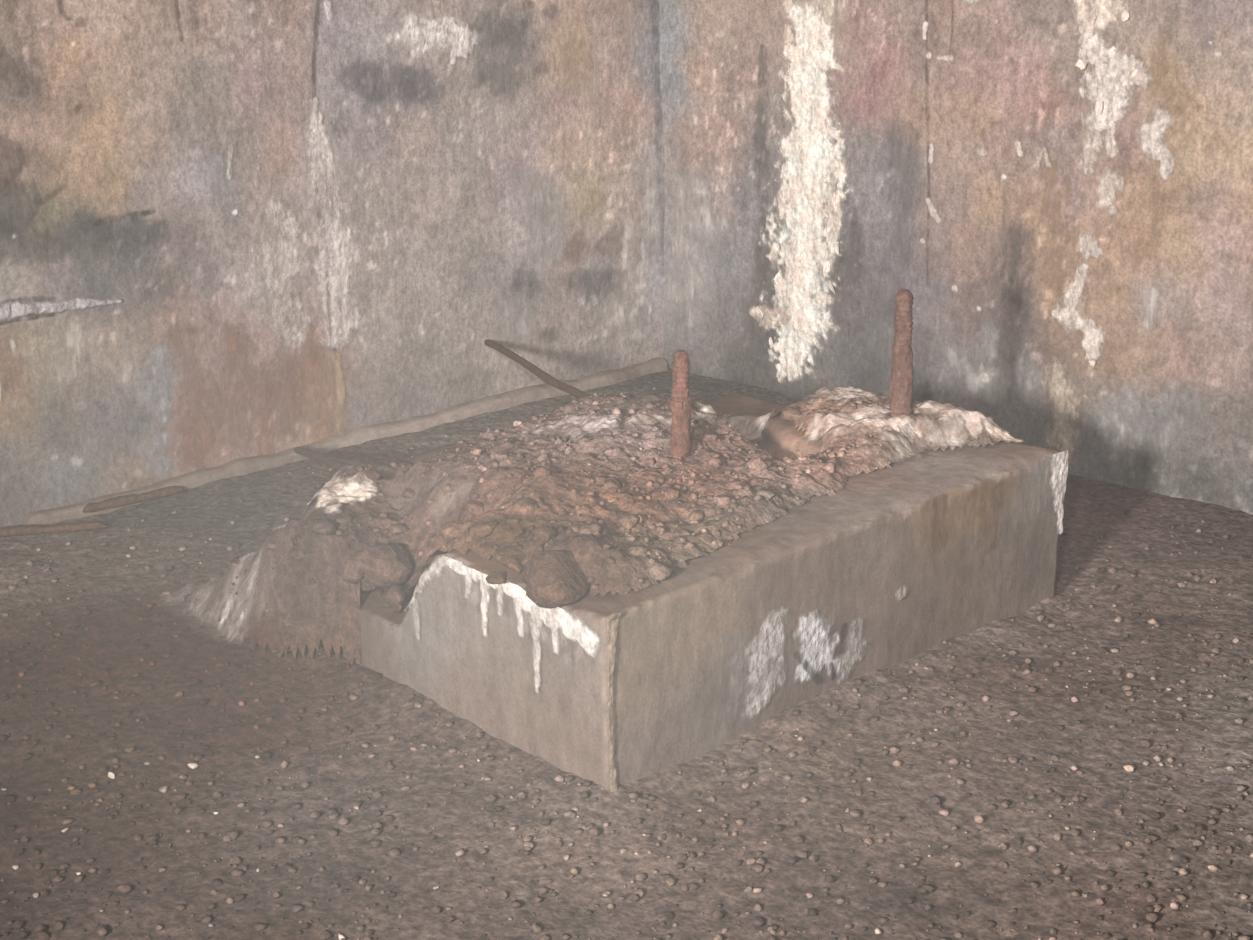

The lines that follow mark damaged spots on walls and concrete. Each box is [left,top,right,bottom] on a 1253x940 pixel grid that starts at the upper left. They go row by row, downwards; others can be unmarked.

crack [311,6,319,84]
water stain [749,0,861,382]
water stain [1074,0,1151,216]
water stain [1139,108,1173,179]
crack [0,298,123,324]
water stain [1054,233,1104,367]
water stain [1143,286,1159,330]
corrosion [484,339,590,399]
water stain [409,556,622,792]
water stain [721,608,866,718]